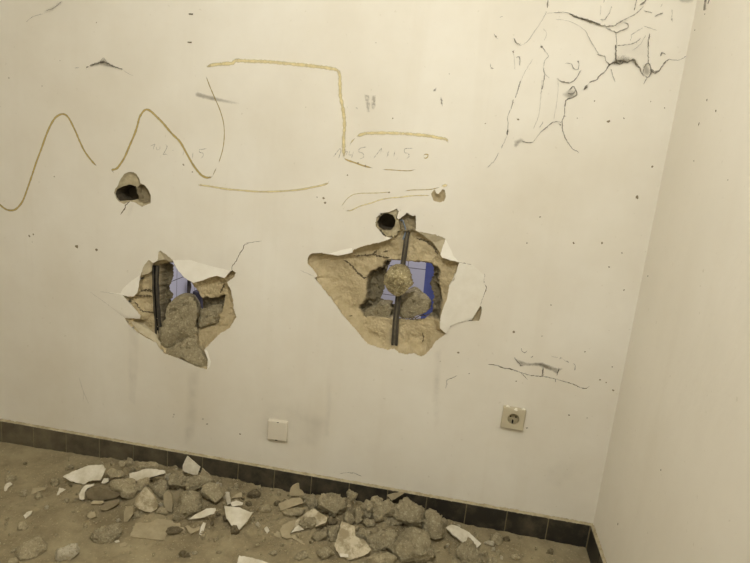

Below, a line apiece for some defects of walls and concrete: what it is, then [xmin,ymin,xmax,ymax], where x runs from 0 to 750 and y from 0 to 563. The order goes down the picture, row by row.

spalling [114,172,151,207]
spalling [109,251,236,369]
spalling [307,209,486,356]
crack [488,364,588,389]